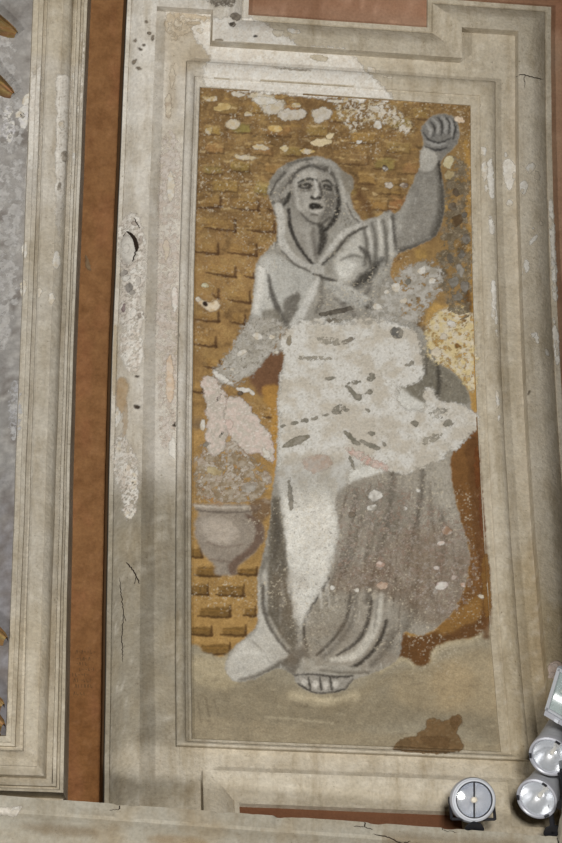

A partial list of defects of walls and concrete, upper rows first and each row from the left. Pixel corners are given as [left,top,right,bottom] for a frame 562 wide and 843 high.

peeling [164,0,414,144]
peeling [235,144,269,160]
peeling [300,133,334,155]
peeling [443,156,454,169]
crack [124,218,140,261]
peeling [194,261,480,613]
damp [466,438,492,638]
crack [119,562,139,661]
damp [393,714,464,754]